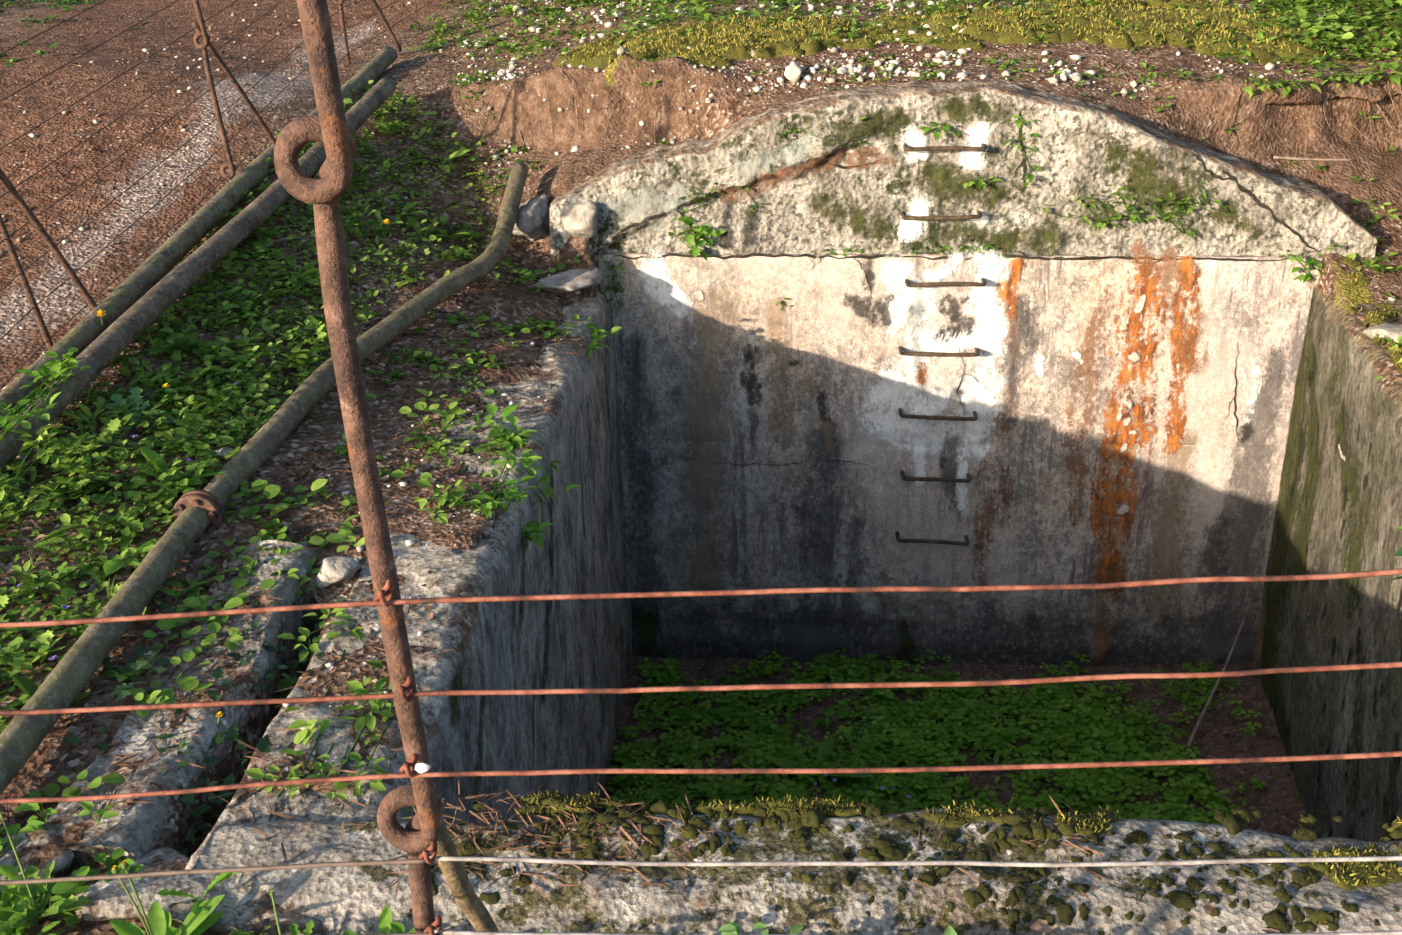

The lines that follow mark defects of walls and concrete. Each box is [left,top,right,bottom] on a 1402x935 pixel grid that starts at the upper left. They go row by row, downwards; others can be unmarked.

leakage [720,200,758,251]
efflorescence [899,124,929,163]
crack [614,138,1315,297]
efflorescence [958,121,994,171]
rust [915,362,927,385]
leakage [842,195,1045,519]
leakage [606,289,866,662]
rust [1060,241,1207,666]
leakage [534,471,555,764]
leakage [1347,642,1367,817]
leakage [1385,732,1399,842]